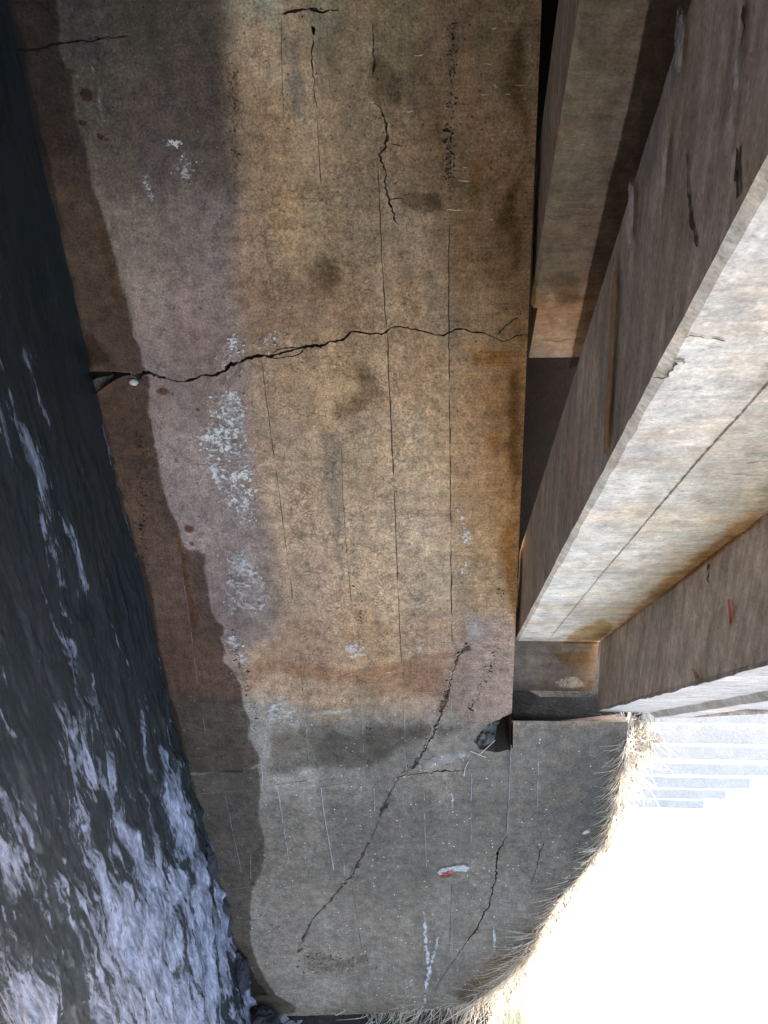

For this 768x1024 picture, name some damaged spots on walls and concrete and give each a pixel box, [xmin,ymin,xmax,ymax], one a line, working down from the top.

crack [370,22,378,75]
crack [375,103,402,224]
crack [132,318,575,382]
damp [102,371,178,545]
damp [196,389,259,539]
damp [217,554,265,614]
damp [157,601,249,741]
crack [297,640,477,952]
spalling [474,707,513,752]
crack [435,836,508,991]